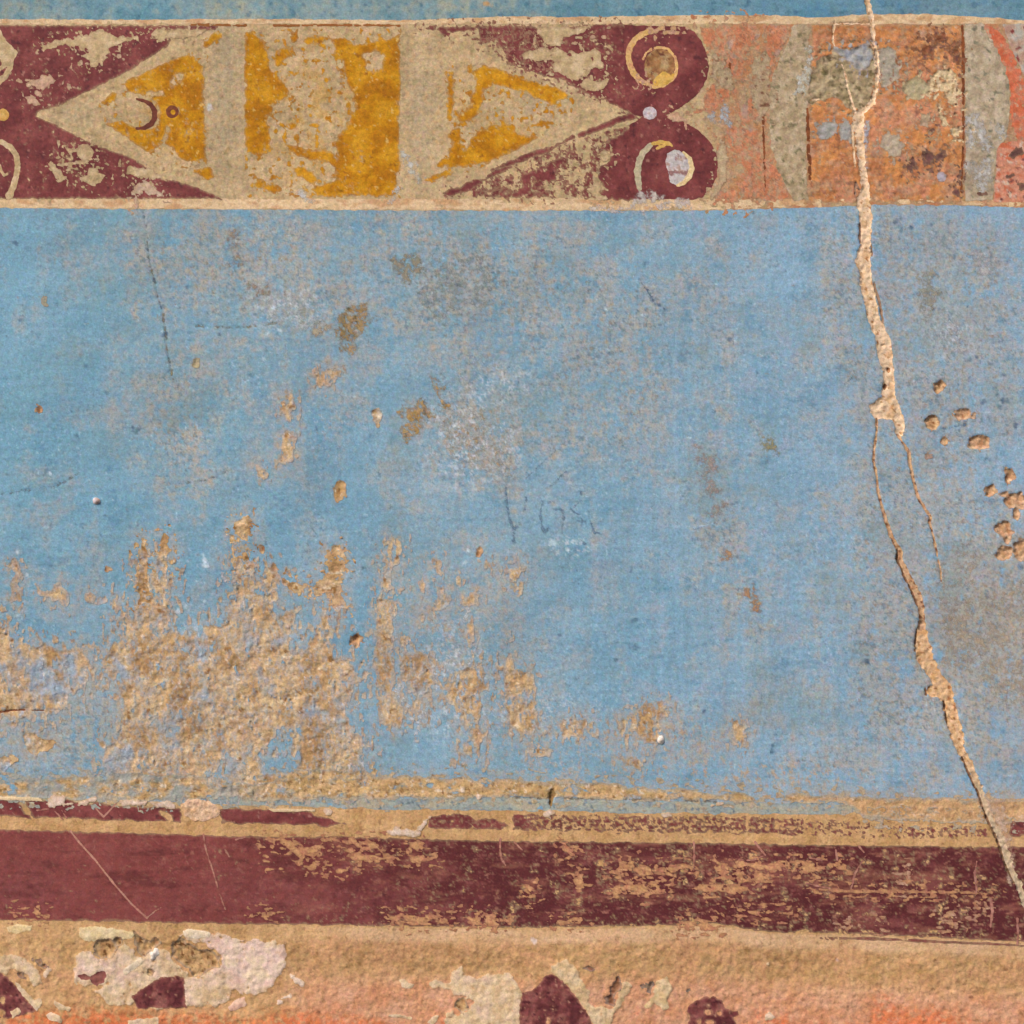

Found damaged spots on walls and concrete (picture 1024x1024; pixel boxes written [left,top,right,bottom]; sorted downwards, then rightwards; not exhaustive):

peeling [6,23,213,117]
peeling [512,16,618,103]
peeling [39,136,171,214]
peeling [699,132,736,207]
crack [831,0,1024,907]
spalling [967,435,990,452]
spalling [983,467,1024,562]
peeling [0,505,1024,838]
peeling [0,954,71,1023]
peeling [73,926,305,1011]
peeling [427,966,522,1024]
peeling [551,959,672,1024]